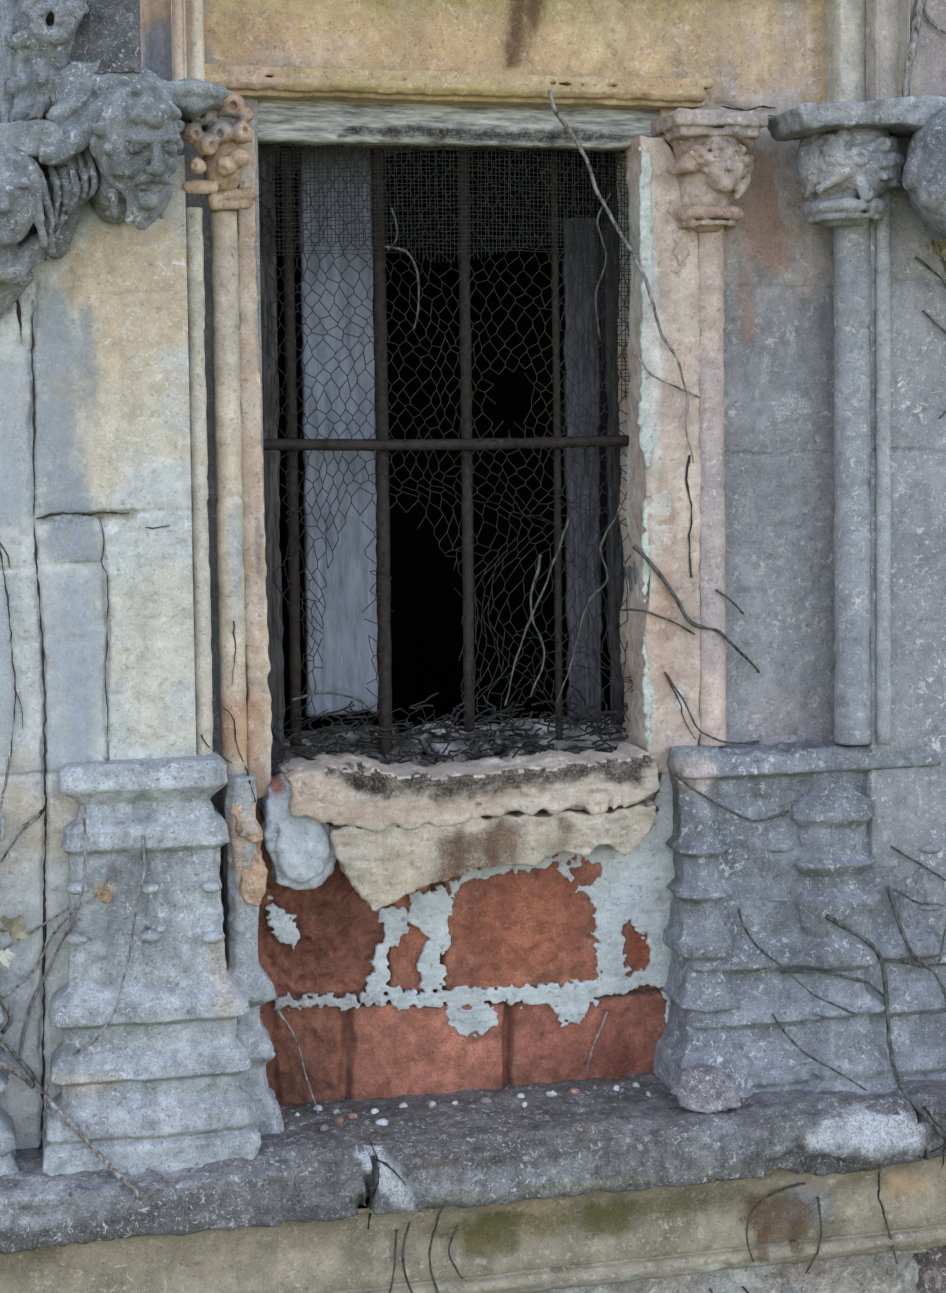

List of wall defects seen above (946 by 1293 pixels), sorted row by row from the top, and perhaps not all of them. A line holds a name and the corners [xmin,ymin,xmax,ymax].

water stain [68,0,174,79]
crack [0,295,170,1155]
peeling [273,773,675,1038]
crack [367,1139,406,1229]
spalling [913,1246,946,1293]